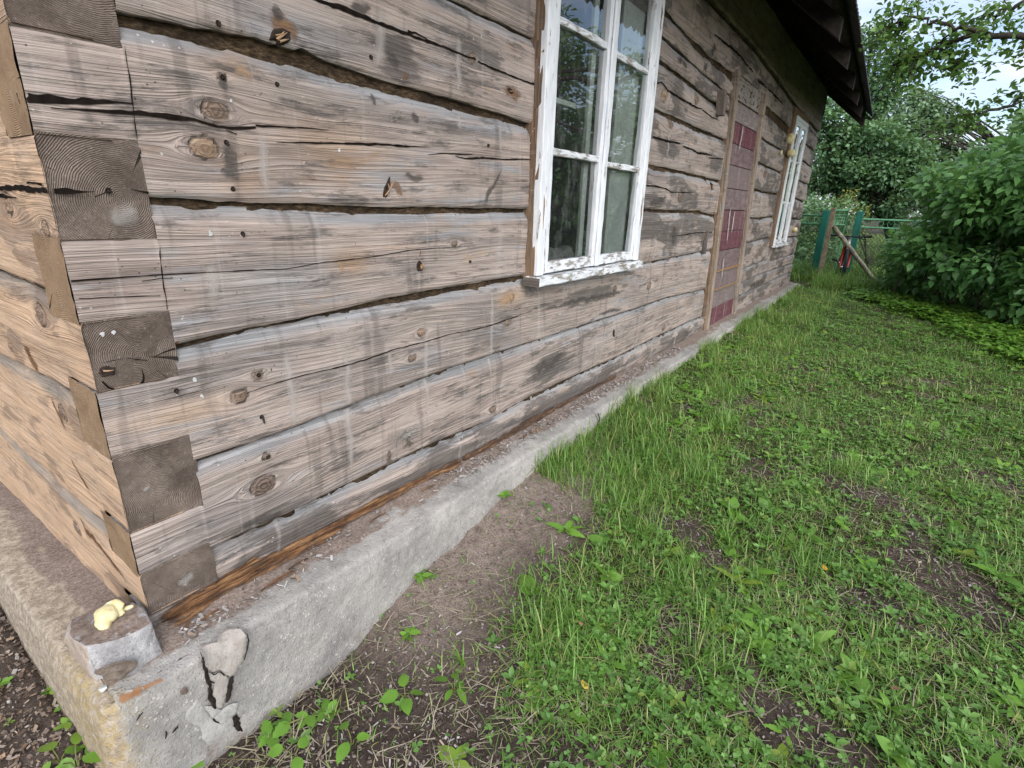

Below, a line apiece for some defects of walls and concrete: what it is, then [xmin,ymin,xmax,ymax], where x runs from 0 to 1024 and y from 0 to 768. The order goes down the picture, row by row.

crack [16,93,530,160]
flaking render [165,626,247,745]
crack [200,634,249,732]